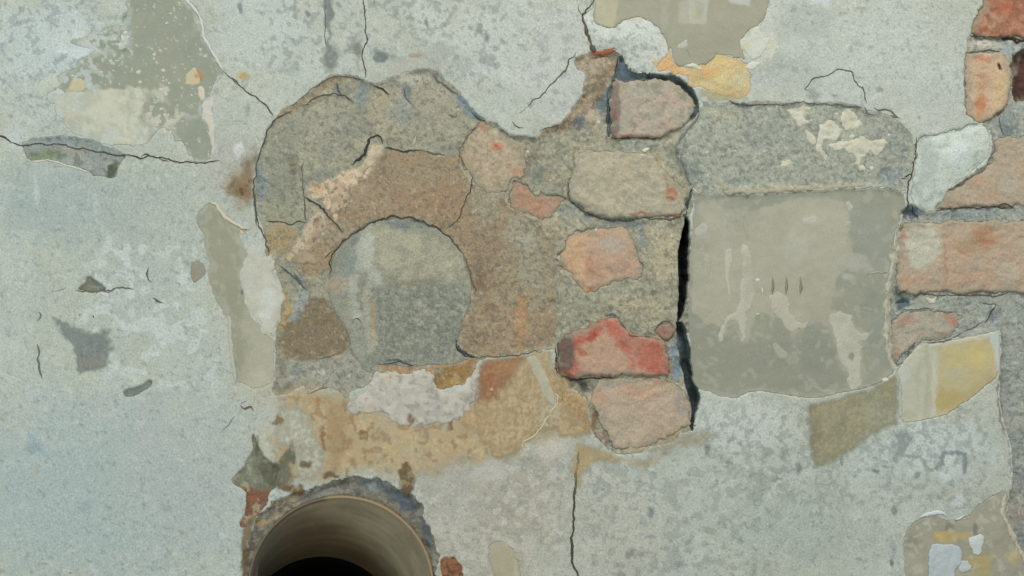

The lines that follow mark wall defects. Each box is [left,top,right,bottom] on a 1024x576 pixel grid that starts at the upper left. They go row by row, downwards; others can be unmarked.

crack [0,135,219,164]
peeling [22,0,225,178]
peeling [593,0,770,76]
crack [727,68,899,118]
peeling [787,105,890,171]
flaking render [955,34,1024,186]
flaking render [190,48,708,455]
crack [513,0,700,431]
peeling [718,244,808,343]
flaking render [809,204,1024,576]
flaking render [232,434,276,528]
crack [570,455,579,576]